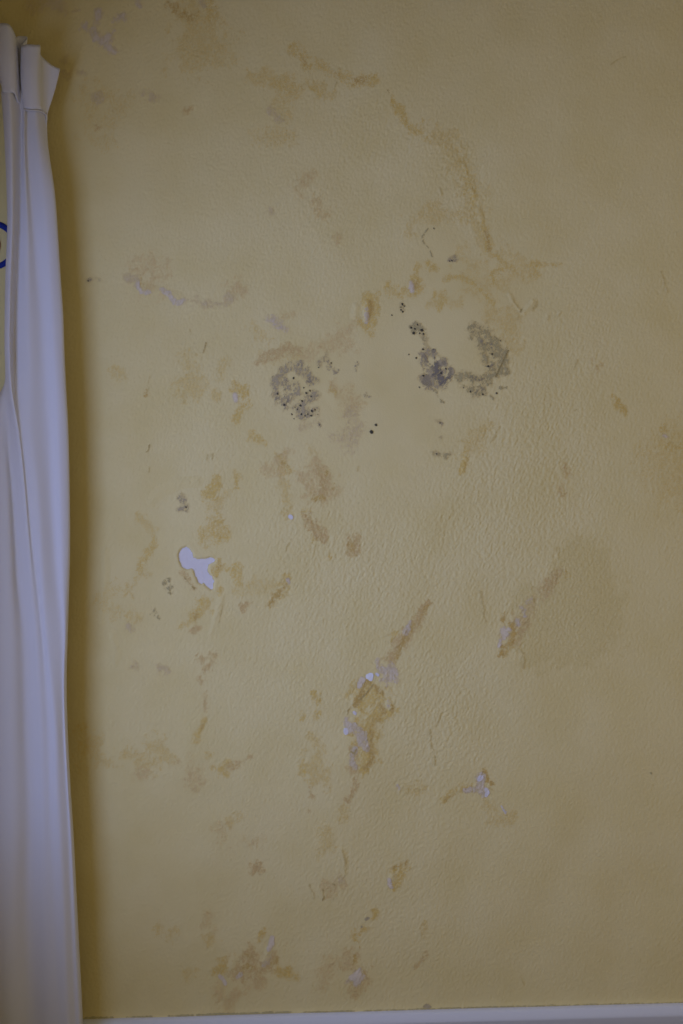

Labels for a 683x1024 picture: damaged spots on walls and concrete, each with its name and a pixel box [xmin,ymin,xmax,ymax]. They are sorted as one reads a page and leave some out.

damp [170,94,561,560]
peeling [179,547,215,590]
peeling [357,673,380,689]